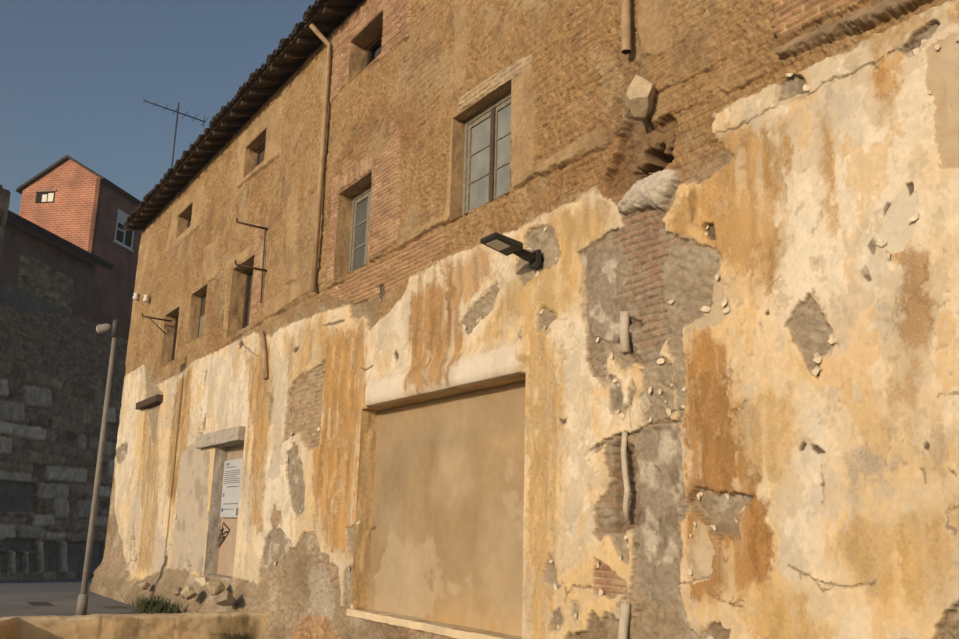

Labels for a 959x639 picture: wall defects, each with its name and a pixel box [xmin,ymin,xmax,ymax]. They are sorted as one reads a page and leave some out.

crack [807,41,918,96]
crack [713,106,776,135]
flaking render [786,295,837,377]
leakage [896,251,932,346]
leakage [140,368,192,569]
flaking render [282,360,326,515]
leakage [286,322,366,557]
flaking render [550,167,754,639]
flaking render [262,526,291,569]
flaking render [342,520,361,609]
flaking render [542,553,560,589]
crack [788,564,877,592]